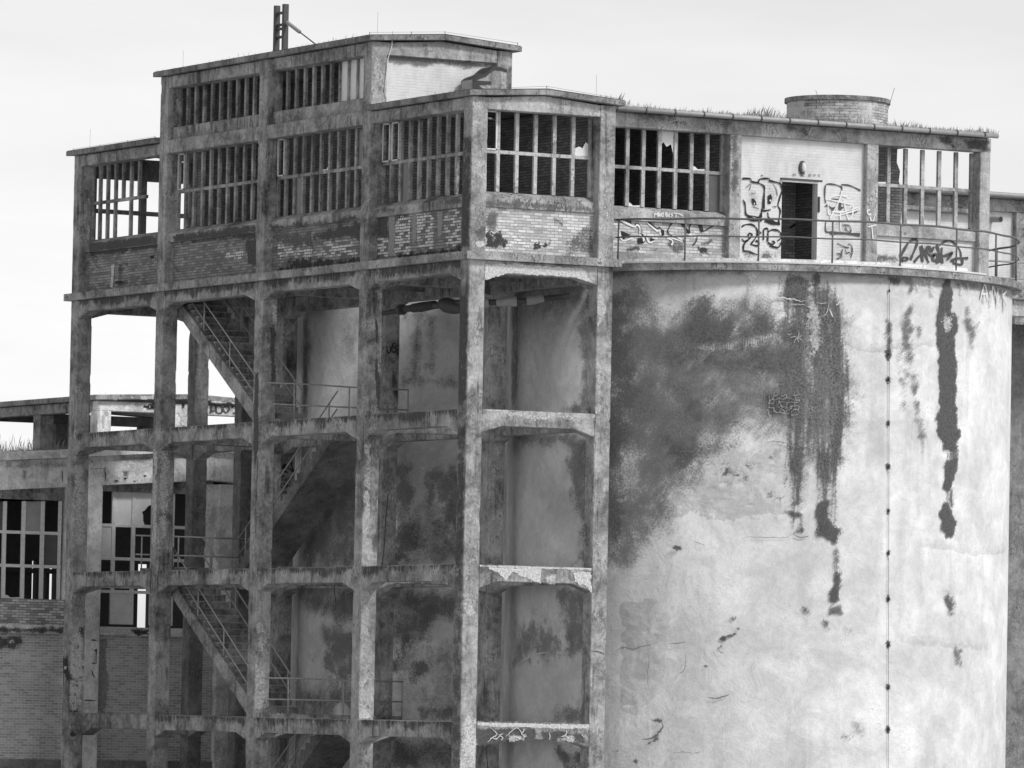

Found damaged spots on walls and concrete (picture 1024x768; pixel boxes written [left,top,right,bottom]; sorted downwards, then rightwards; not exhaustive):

leakage [77,293,468,768]
peeling [480,565,592,592]
leakage [513,589,583,667]
leakage [554,745,580,768]
leakage [486,271,858,626]
leakage [889,277,1005,538]